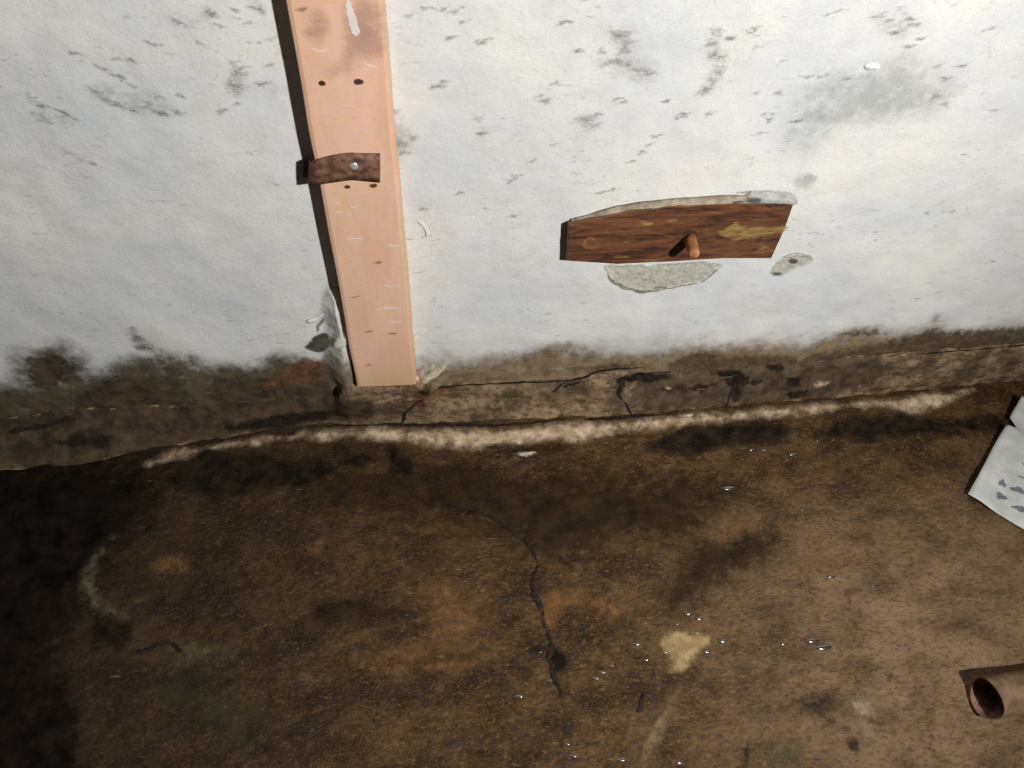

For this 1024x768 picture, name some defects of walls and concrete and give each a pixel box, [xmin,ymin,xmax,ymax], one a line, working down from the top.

spalling [605,261,721,294]
spalling [773,253,813,275]
spalling [307,318,330,353]
crack [317,367,678,427]
damp [433,328,1024,411]
damp [649,422,789,455]
damp [813,414,1001,442]
damp [0,346,719,768]
crack [442,502,566,697]
damp [670,537,764,608]